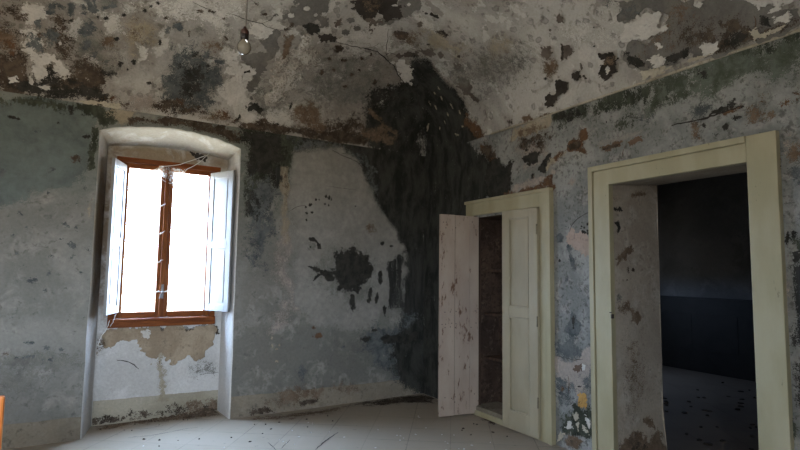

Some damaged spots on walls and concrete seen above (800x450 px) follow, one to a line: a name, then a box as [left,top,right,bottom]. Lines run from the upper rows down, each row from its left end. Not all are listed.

peeling [17,1,72,90]
peeling [79,86,164,114]
peeling [93,0,449,127]
peeling [508,0,800,172]
water stain [0,0,552,406]
peeling [555,226,589,282]
water stain [92,350,217,425]
peeling [101,324,220,366]
water stain [249,365,361,416]
peeling [555,346,592,450]